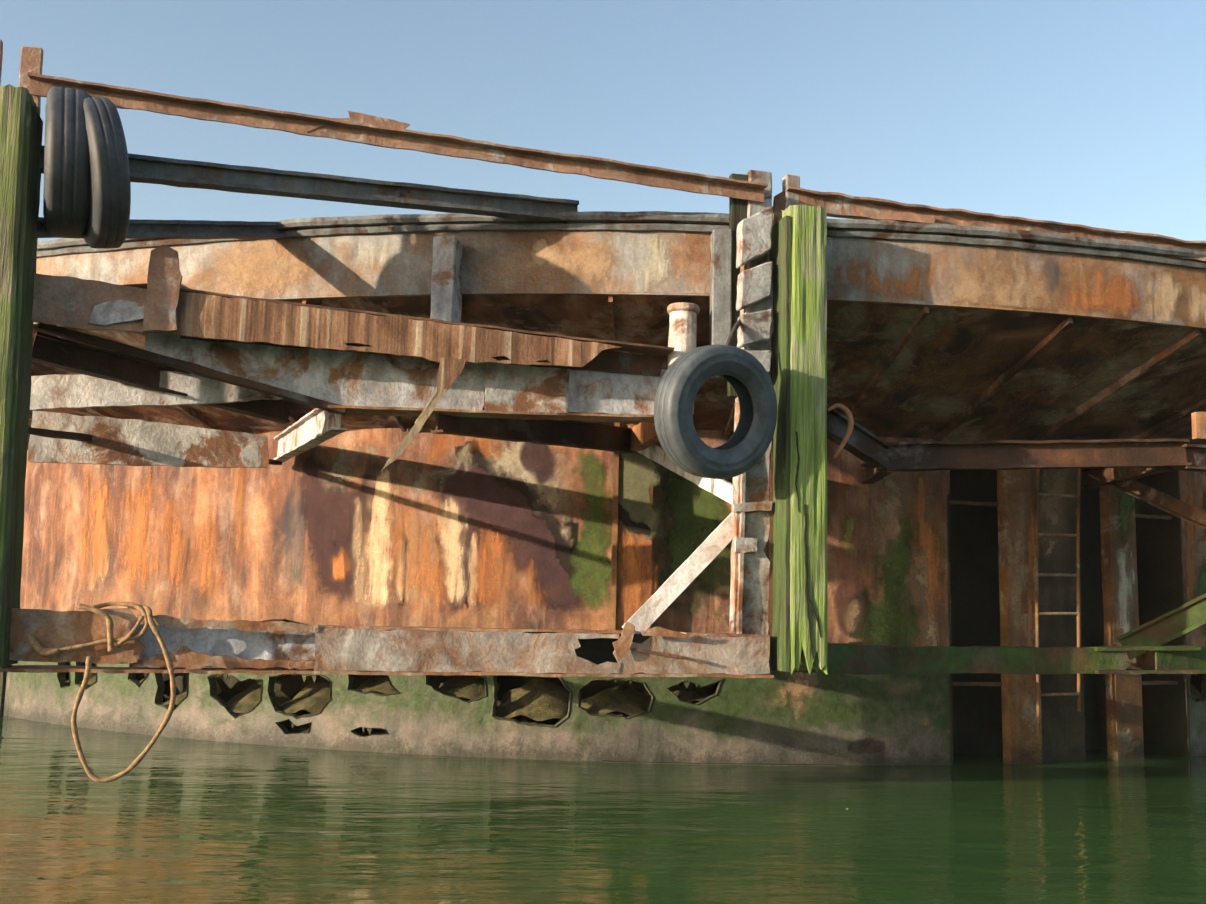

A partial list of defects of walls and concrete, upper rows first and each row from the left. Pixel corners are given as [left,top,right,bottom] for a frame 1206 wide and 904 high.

rust [951,247,1206,323]
rust [81,478,151,589]
rust [164,498,186,585]
rust [302,457,387,599]
rust [393,452,581,611]
damp [570,453,613,607]
rust [617,532,657,612]
crack [795,432,821,662]